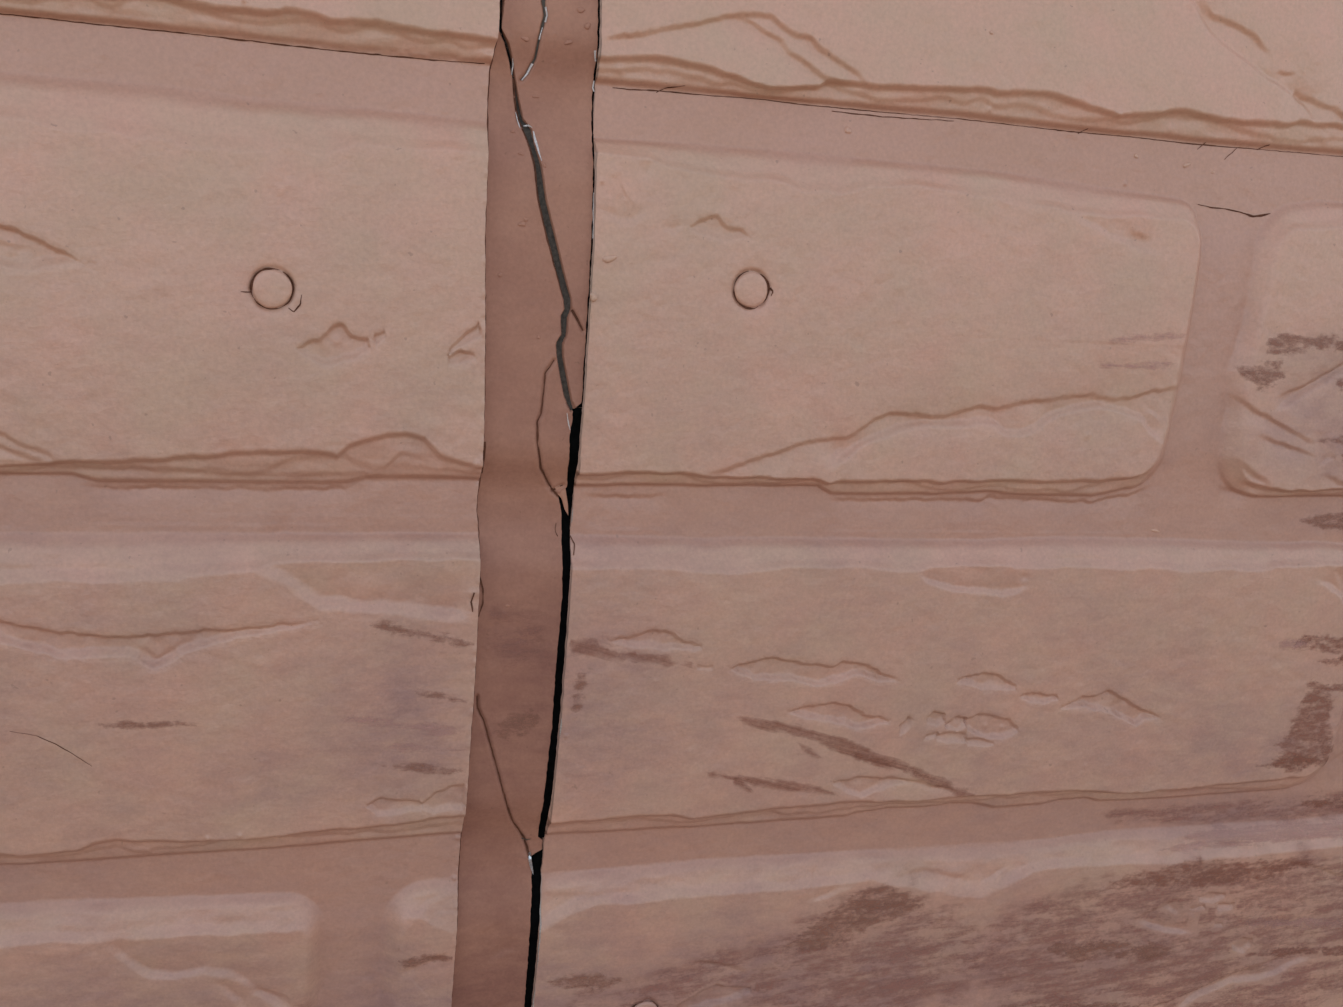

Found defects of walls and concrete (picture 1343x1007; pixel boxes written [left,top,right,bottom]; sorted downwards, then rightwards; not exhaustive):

crack [1183,0,1343,138]
crack [613,86,1343,160]
crack [1198,204,1271,217]
crack [694,382,1185,483]
crack [1220,360,1343,491]
crack [0,0,878,1007]
crack [1307,564,1343,608]
crack [1145,945,1327,1007]